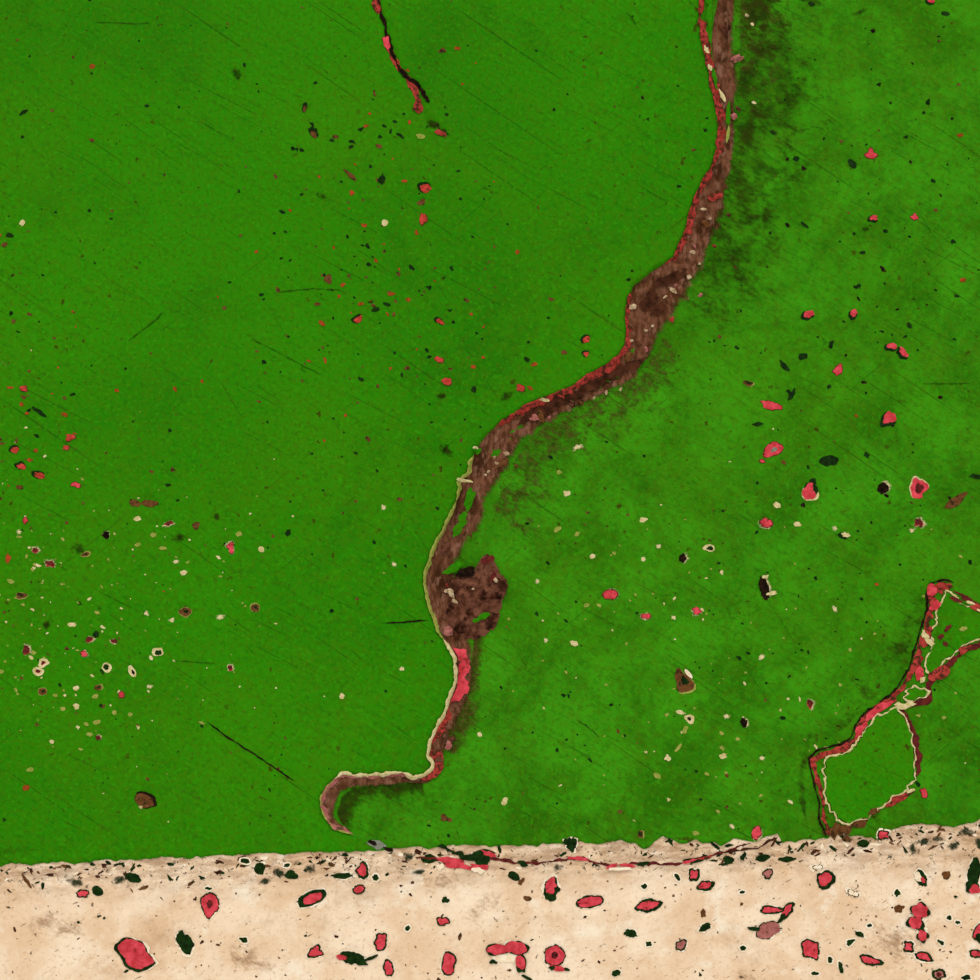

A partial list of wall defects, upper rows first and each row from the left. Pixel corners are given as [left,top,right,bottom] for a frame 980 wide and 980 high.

crack [320,0,744,835]